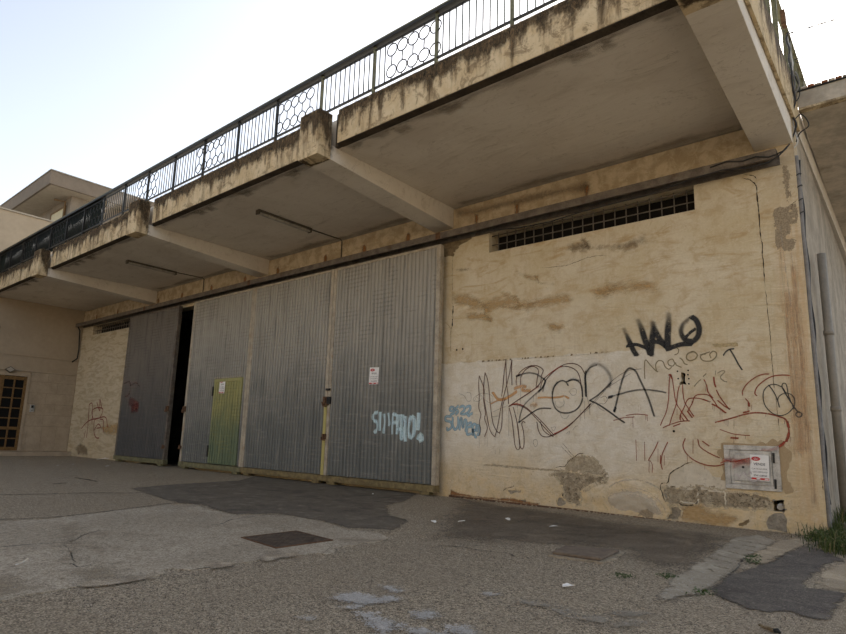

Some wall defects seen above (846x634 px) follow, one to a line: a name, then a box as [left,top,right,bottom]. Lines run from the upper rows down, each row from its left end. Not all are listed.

water stain [0,0,587,279]
water stain [455,295,569,320]
crack [744,175,779,425]
flaking render [483,454,609,506]
flaking render [661,484,787,528]